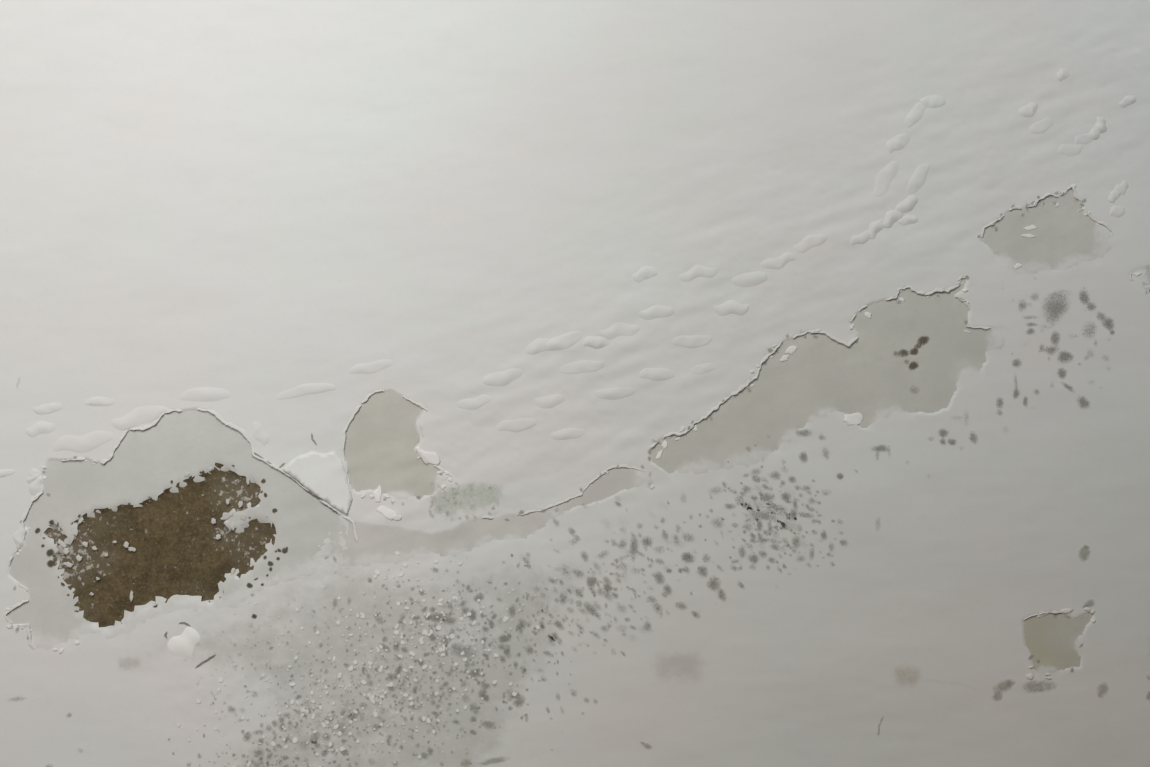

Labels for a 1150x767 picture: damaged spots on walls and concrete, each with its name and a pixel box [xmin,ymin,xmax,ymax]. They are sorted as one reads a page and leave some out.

peeling [978,183,1113,275]
water stain [1041,334,1071,388]
peeling [3,276,1006,654]
water stain [232,551,528,767]
peeling [1023,601,1095,690]